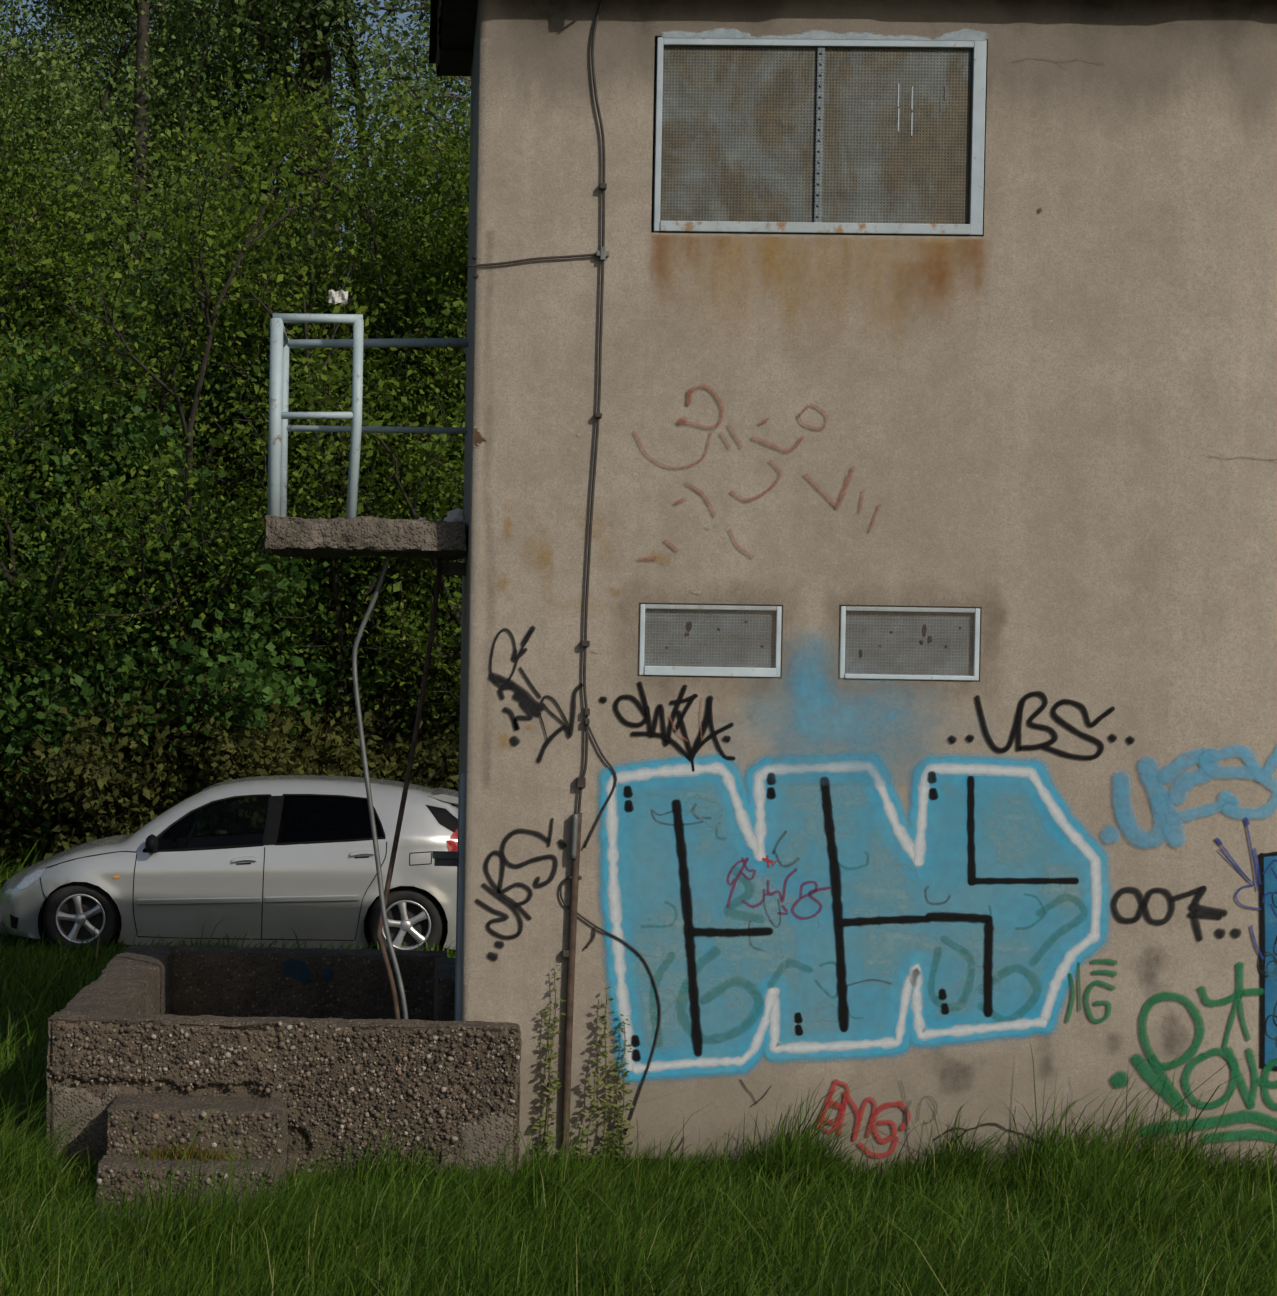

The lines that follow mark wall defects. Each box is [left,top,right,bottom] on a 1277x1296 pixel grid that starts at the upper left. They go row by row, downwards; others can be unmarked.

spalling [48,1020,520,1211]